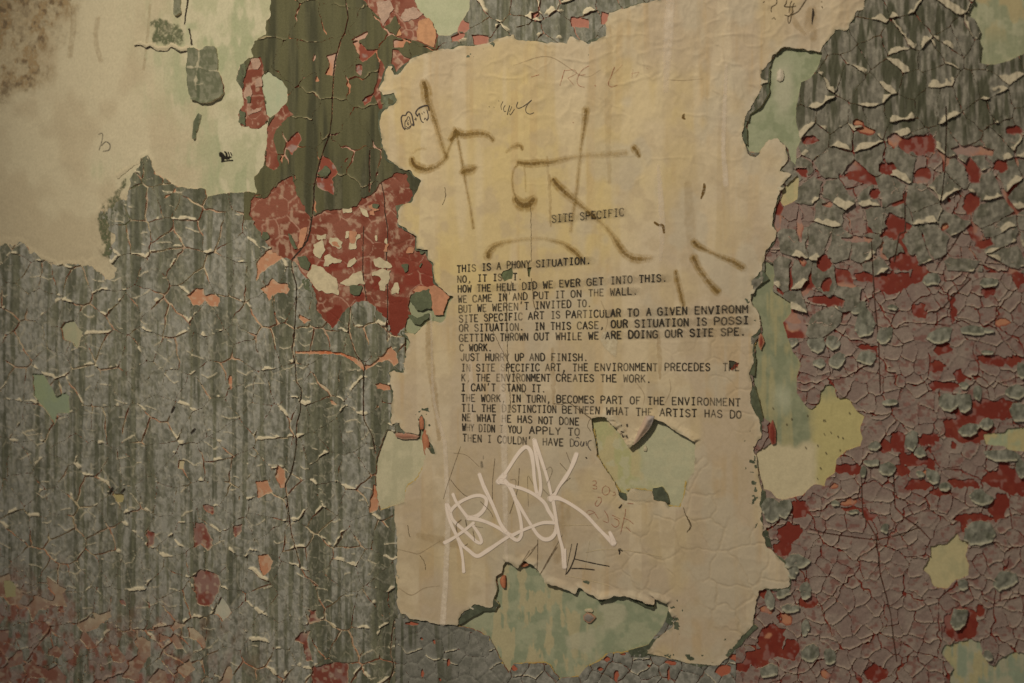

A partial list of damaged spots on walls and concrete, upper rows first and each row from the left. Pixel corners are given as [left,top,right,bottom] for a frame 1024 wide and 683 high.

crack [284,6,349,586]
peeling [0,0,655,683]
crack [348,150,388,450]
peeling [395,0,1024,683]
crack [871,193,906,391]
crack [939,108,947,205]
crack [809,469,931,662]